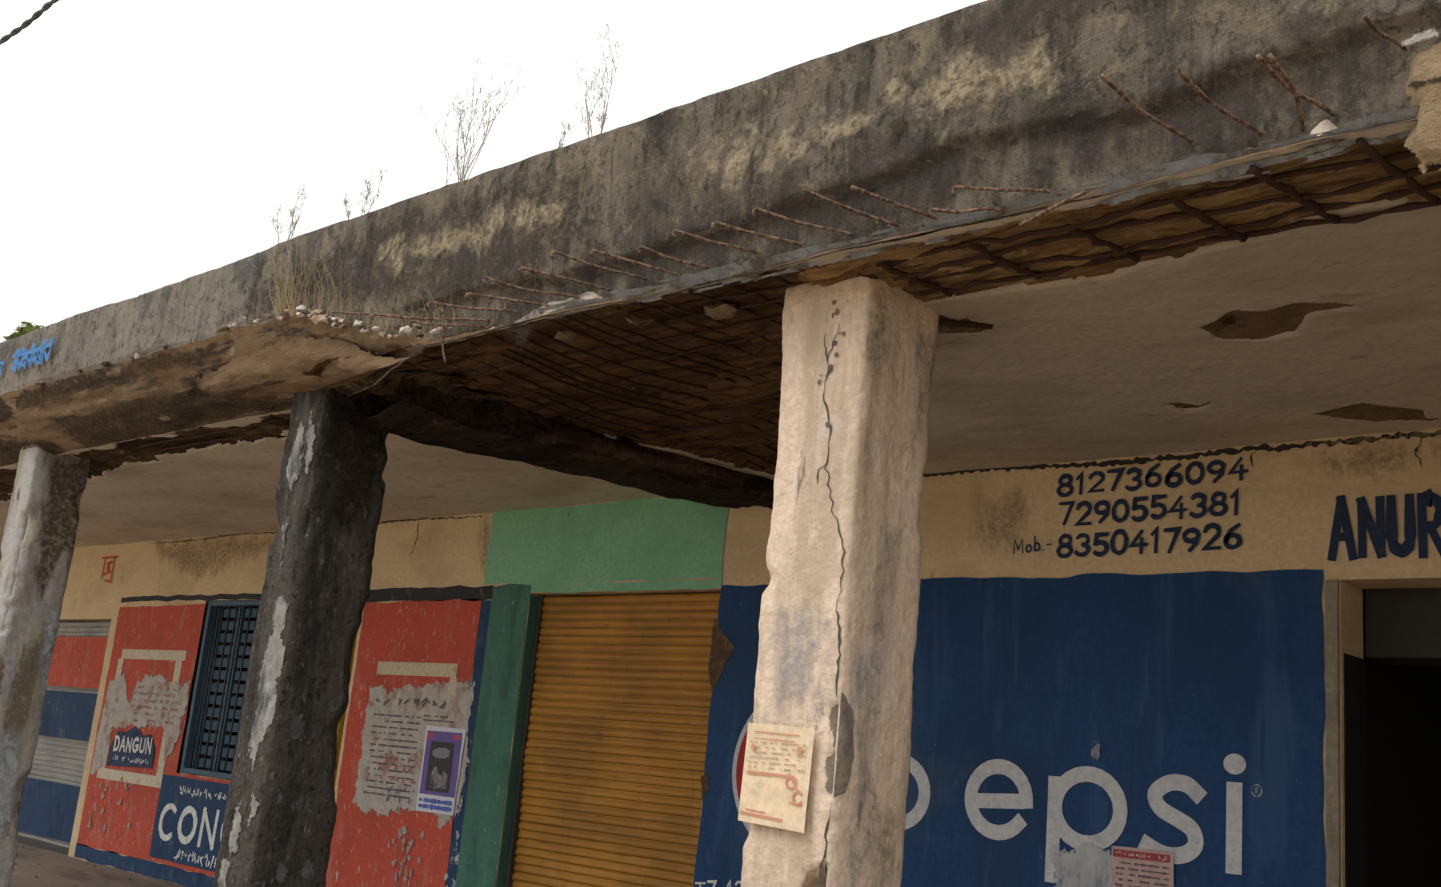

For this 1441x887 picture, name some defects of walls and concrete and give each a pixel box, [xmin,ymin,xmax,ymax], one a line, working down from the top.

damp [235,139,1000,340]
spalling [216,15,1441,475]
spalling [0,460,19,501]
spalling [65,408,316,493]
crack [817,300,846,699]
damp [3,636,50,766]
peeling [218,782,315,887]
peeling [247,596,289,772]
peeling [444,679,475,887]
crack [820,807,831,869]
spalling [825,693,854,797]
peeling [1051,843,1112,887]